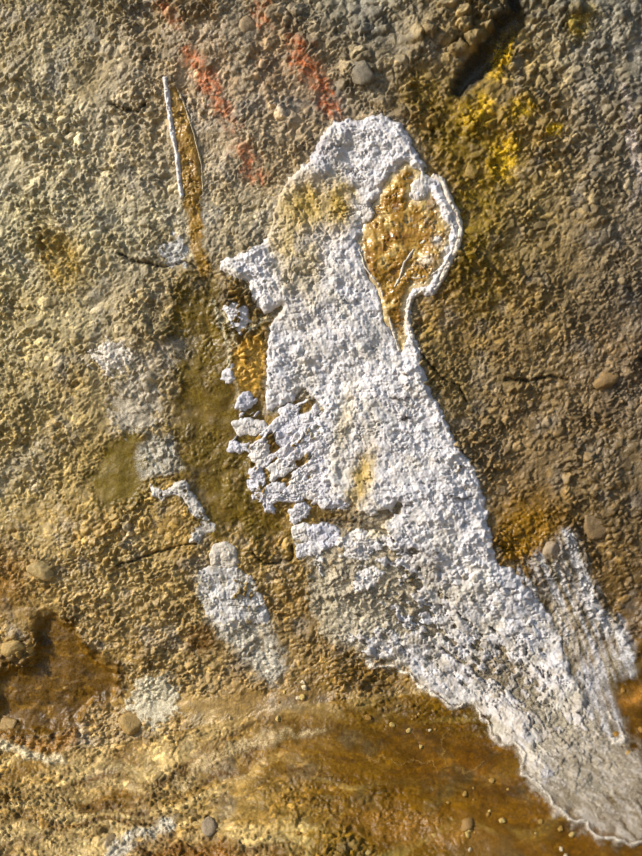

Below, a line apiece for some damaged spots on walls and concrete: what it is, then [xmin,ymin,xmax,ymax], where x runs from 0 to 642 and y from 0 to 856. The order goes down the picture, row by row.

damp [216,0,255,100]
damp [488,36,514,78]
crack [119,253,197,268]
damp [86,83,642,845]
damp [105,817,175,856]